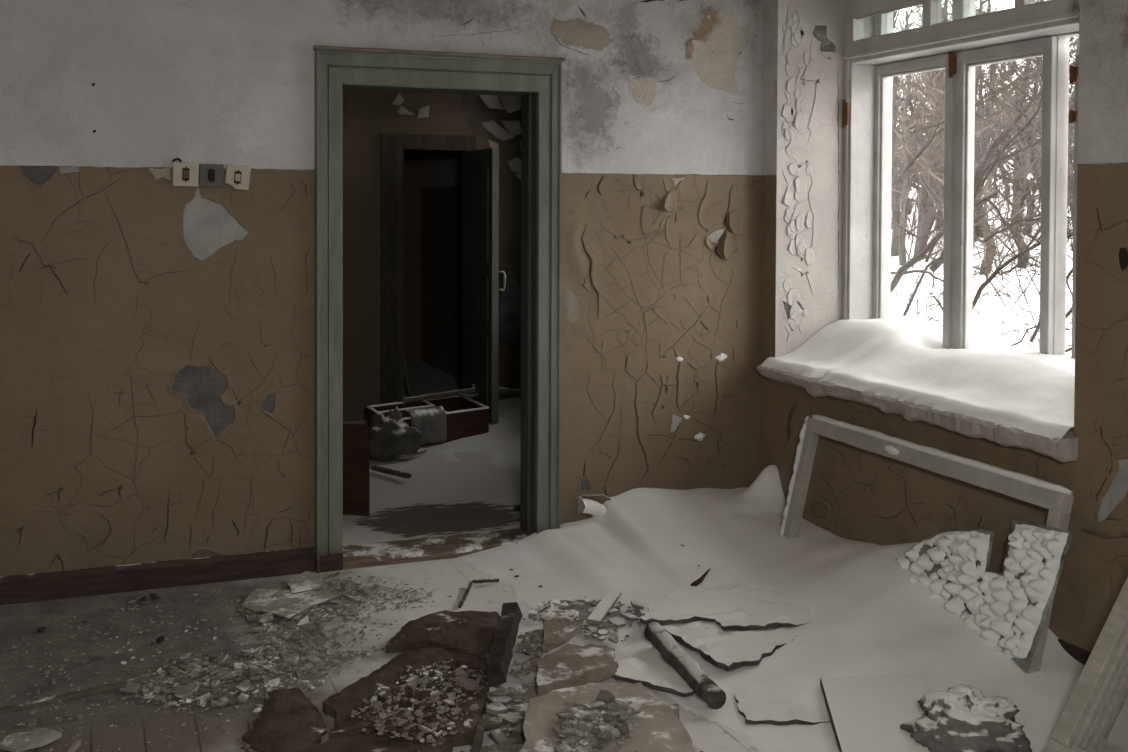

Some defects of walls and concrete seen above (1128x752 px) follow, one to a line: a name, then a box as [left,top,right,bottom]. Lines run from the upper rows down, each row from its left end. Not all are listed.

flaking render [627,73,659,108]
flaking render [680,6,748,97]
peeling [782,12,839,141]
peeling [177,186,254,266]
peeling [640,173,690,235]
peeling [698,208,741,261]
peeling [782,162,814,265]
crack [580,122,747,497]
peeling [779,278,808,331]